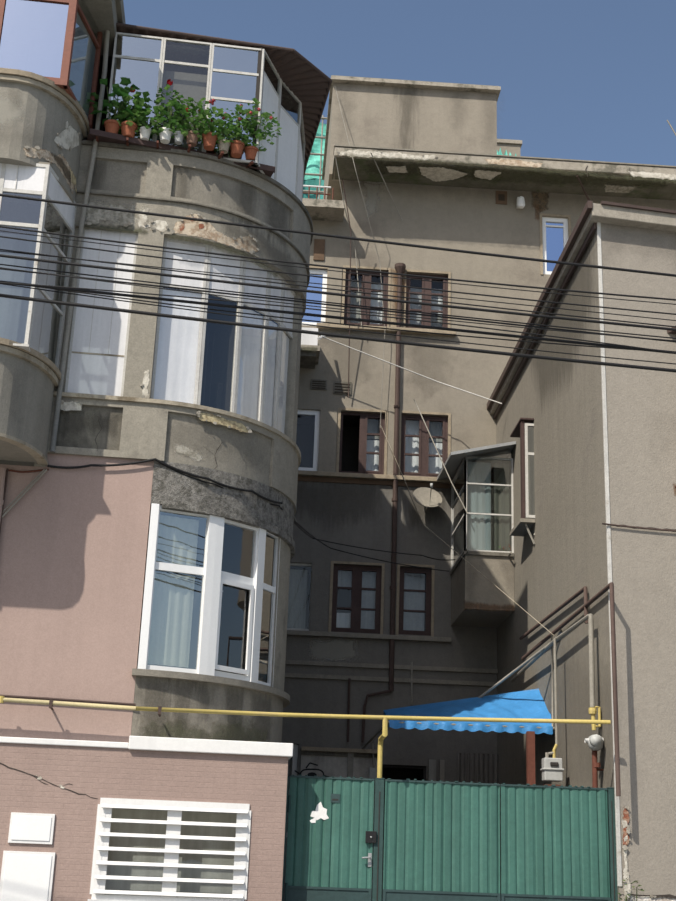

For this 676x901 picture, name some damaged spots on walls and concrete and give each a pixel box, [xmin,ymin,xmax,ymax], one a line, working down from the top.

flaking render [24,121,81,195]
spalling [337,149,543,182]
spalling [605,171,676,193]
flaking render [150,213,259,254]
peeling [196,411,252,433]
crack [0,763,98,799]
flaking render [622,806,676,901]